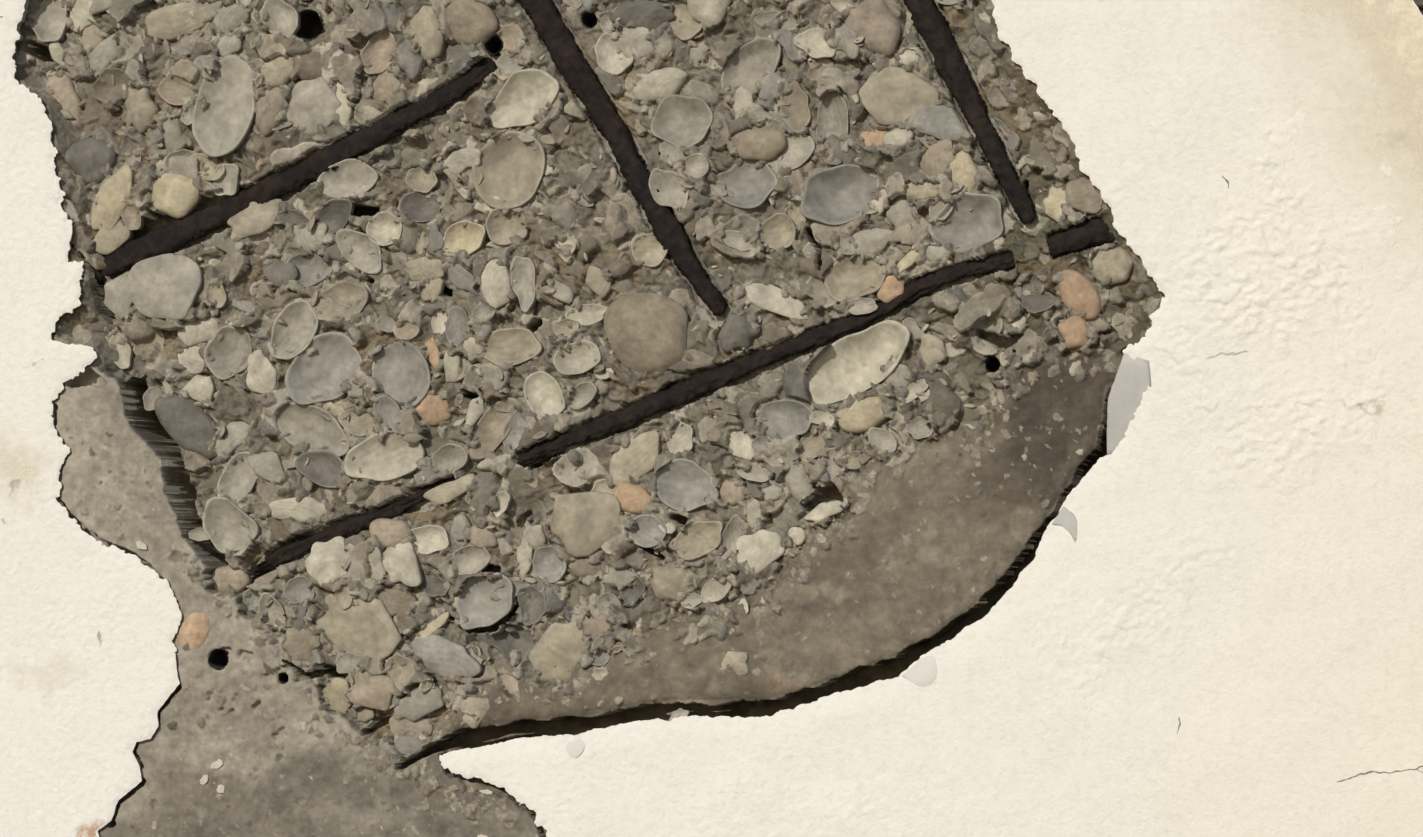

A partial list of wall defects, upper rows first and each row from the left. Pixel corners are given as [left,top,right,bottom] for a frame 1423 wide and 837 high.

spalling [610,17,636,40]
spalling [518,135,535,151]
spalling [188,161,228,216]
spalling [278,179,335,221]
spalling [315,233,337,264]
peeling [1107,354,1151,455]
spalling [188,528,210,541]
spalling [177,612,210,650]
spalling [208,649,229,669]
spalling [721,651,749,676]
spalling [339,704,418,761]
spalling [461,777,516,800]